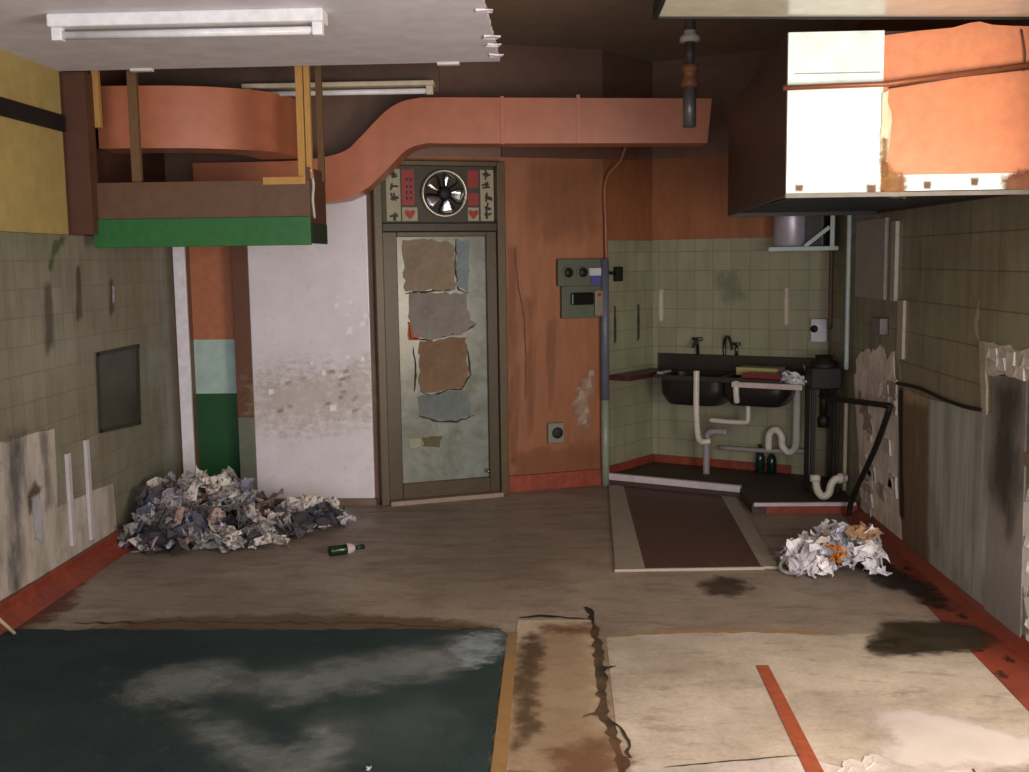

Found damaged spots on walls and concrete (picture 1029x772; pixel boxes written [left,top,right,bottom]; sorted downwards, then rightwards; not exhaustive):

rust [867,138,906,197]
rust [1002,170,1029,190]
peeling [572,370,594,429]
spalling [854,345,902,540]
spalling [0,429,117,601]
leakage [698,577,746,595]
crack [519,607,836,772]